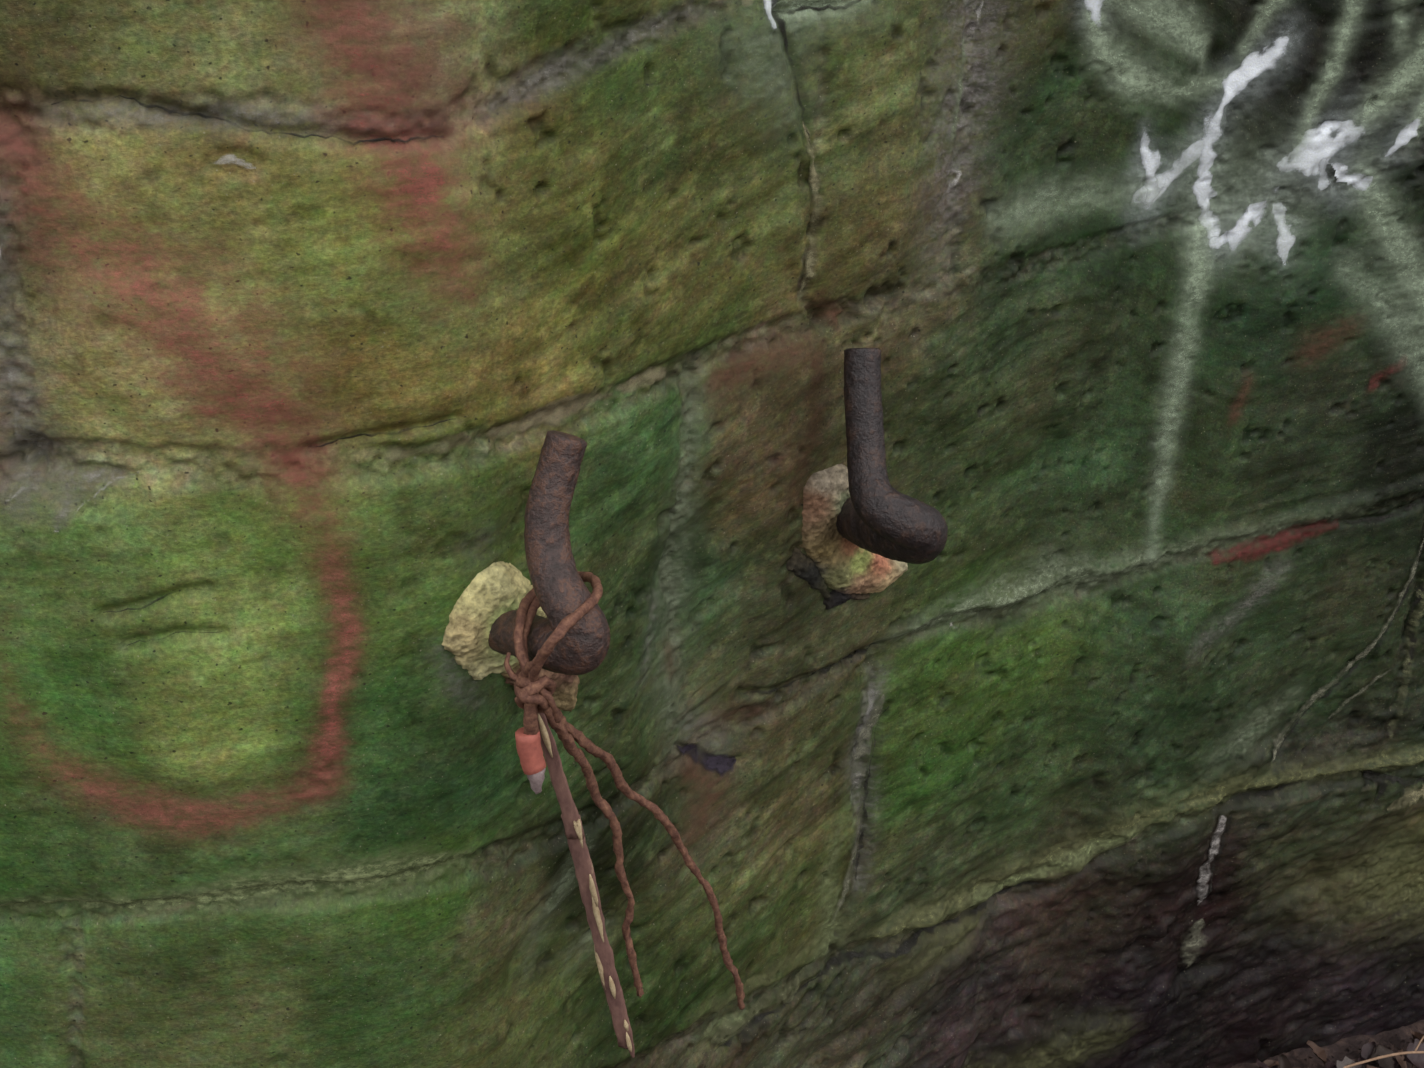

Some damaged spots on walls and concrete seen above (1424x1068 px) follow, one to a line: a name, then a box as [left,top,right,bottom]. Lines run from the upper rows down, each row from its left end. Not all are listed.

crack [771,0,859,200]
crack [800,243,817,292]